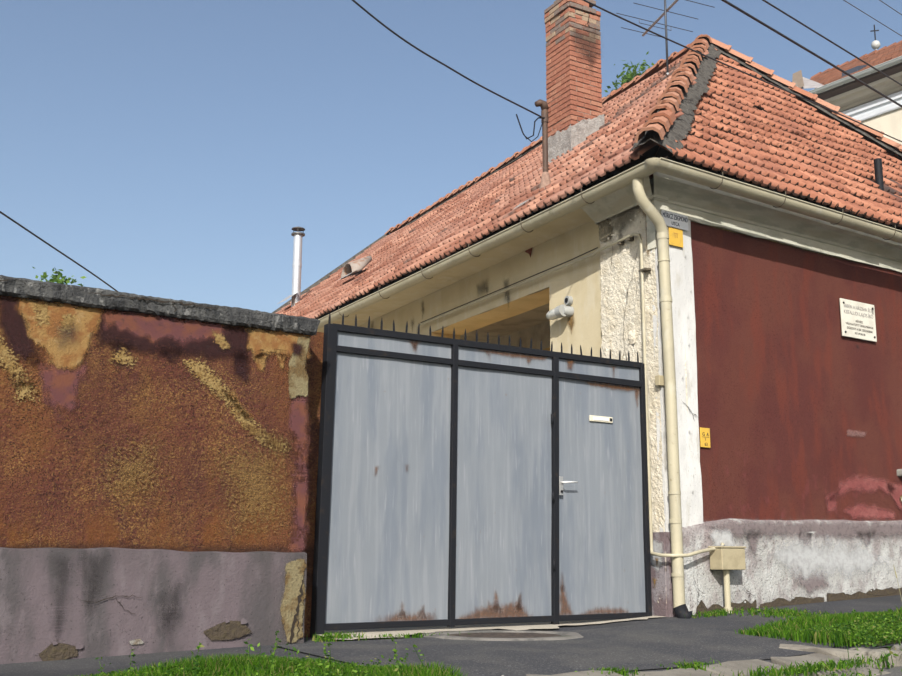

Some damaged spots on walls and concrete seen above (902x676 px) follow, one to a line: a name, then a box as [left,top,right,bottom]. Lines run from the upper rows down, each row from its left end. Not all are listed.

spalling [18,298,230,369]
damp [0,298,86,411]
damp [98,311,293,459]
efflorescence [711,531,733,546]
peeling [712,520,902,552]
damp [777,539,879,578]
rust [461,596,527,619]